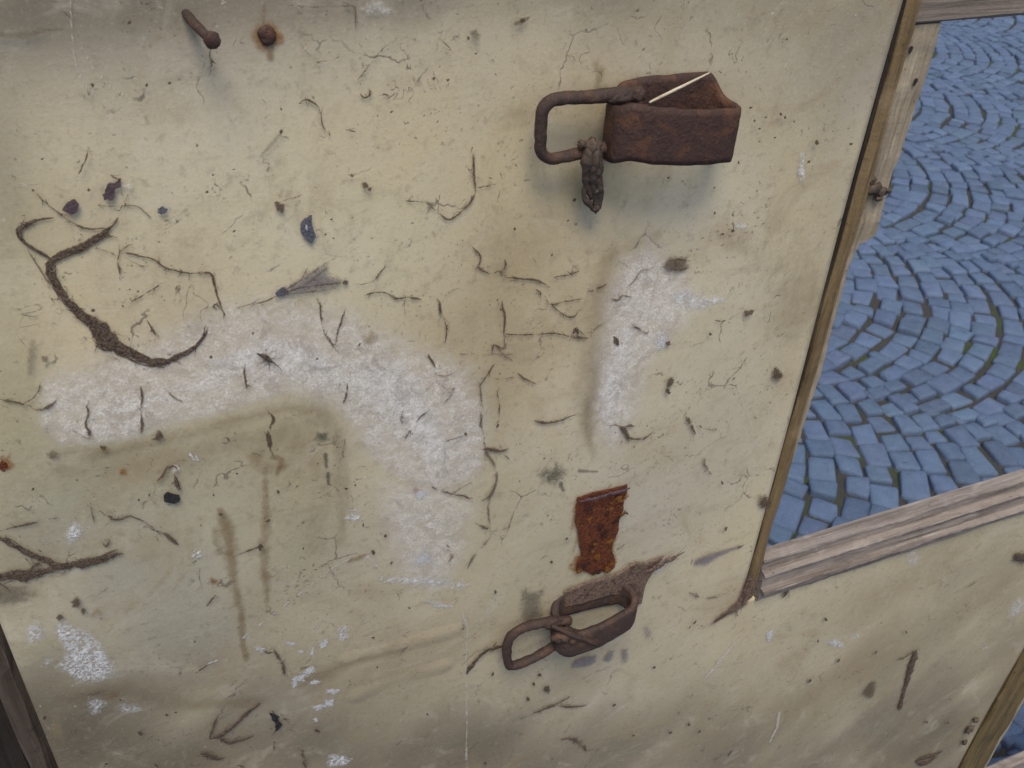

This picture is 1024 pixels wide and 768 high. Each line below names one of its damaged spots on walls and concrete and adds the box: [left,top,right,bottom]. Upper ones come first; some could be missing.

crack [407,147,495,227]
crack [16,193,257,433]
crack [318,302,345,351]
crack [360,247,668,569]
crack [0,503,179,592]
rust [570,484,630,575]